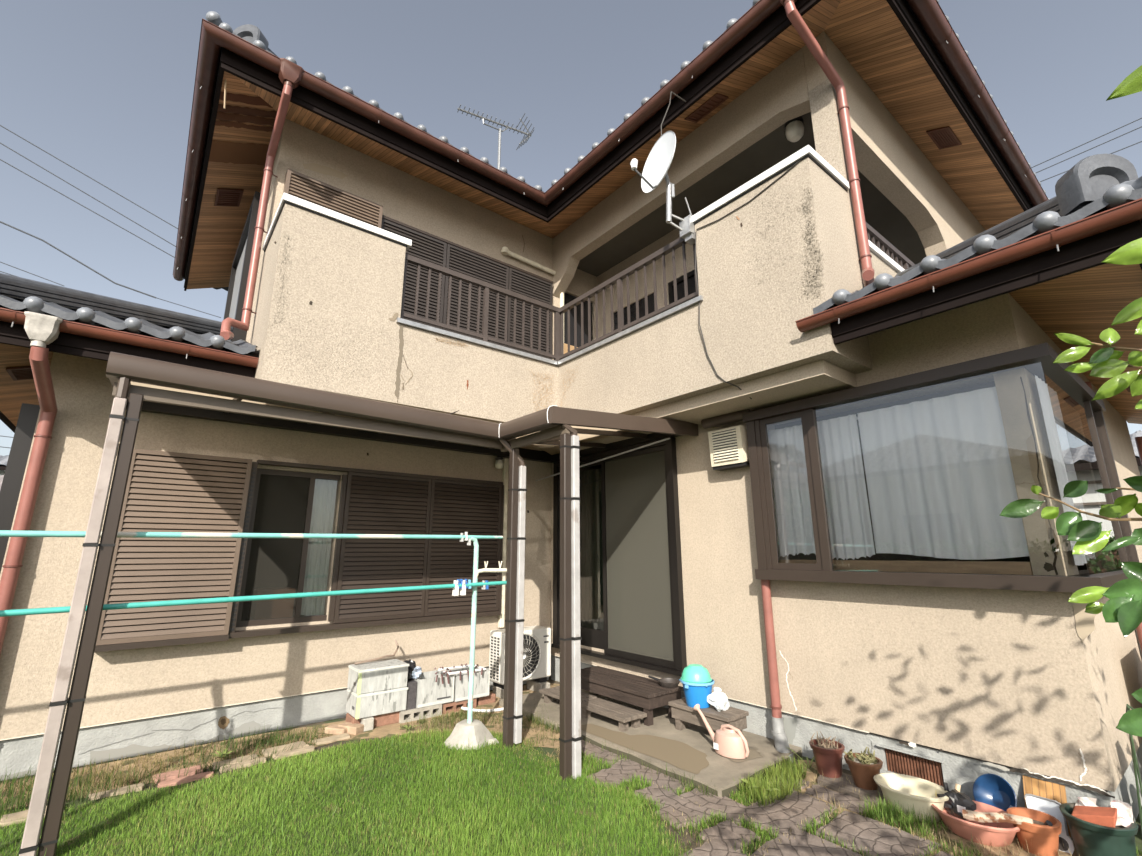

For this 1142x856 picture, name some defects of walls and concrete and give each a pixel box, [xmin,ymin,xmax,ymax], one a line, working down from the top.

crack [779,650,797,710]
leakage [581,724,763,774]
crack [1078,748,1087,781]